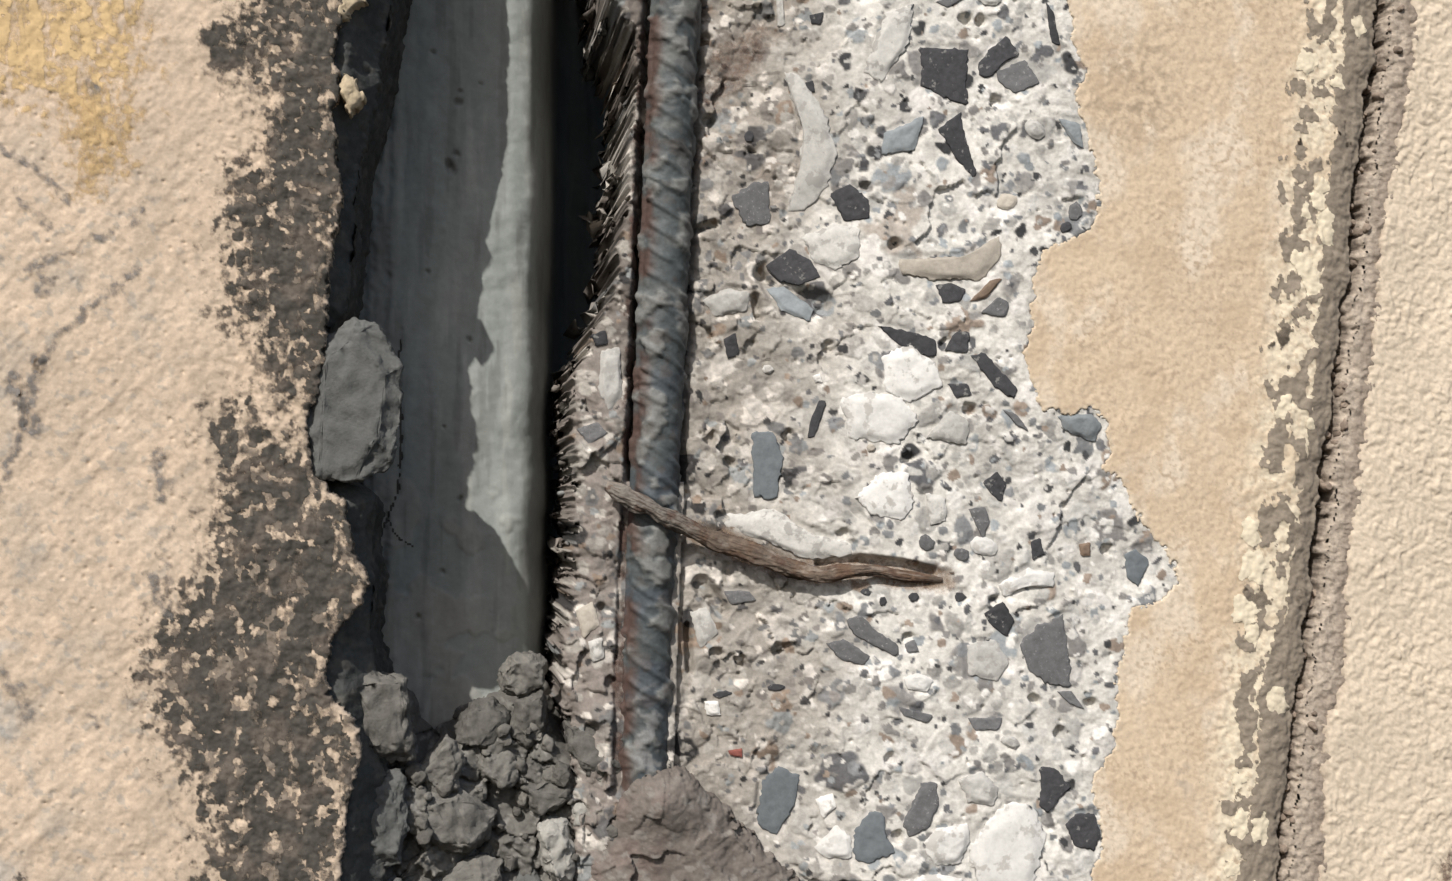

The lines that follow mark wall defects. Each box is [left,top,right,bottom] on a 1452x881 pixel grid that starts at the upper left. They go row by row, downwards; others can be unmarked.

spalling [328,0,1179,881]
crack [1276,0,1418,881]